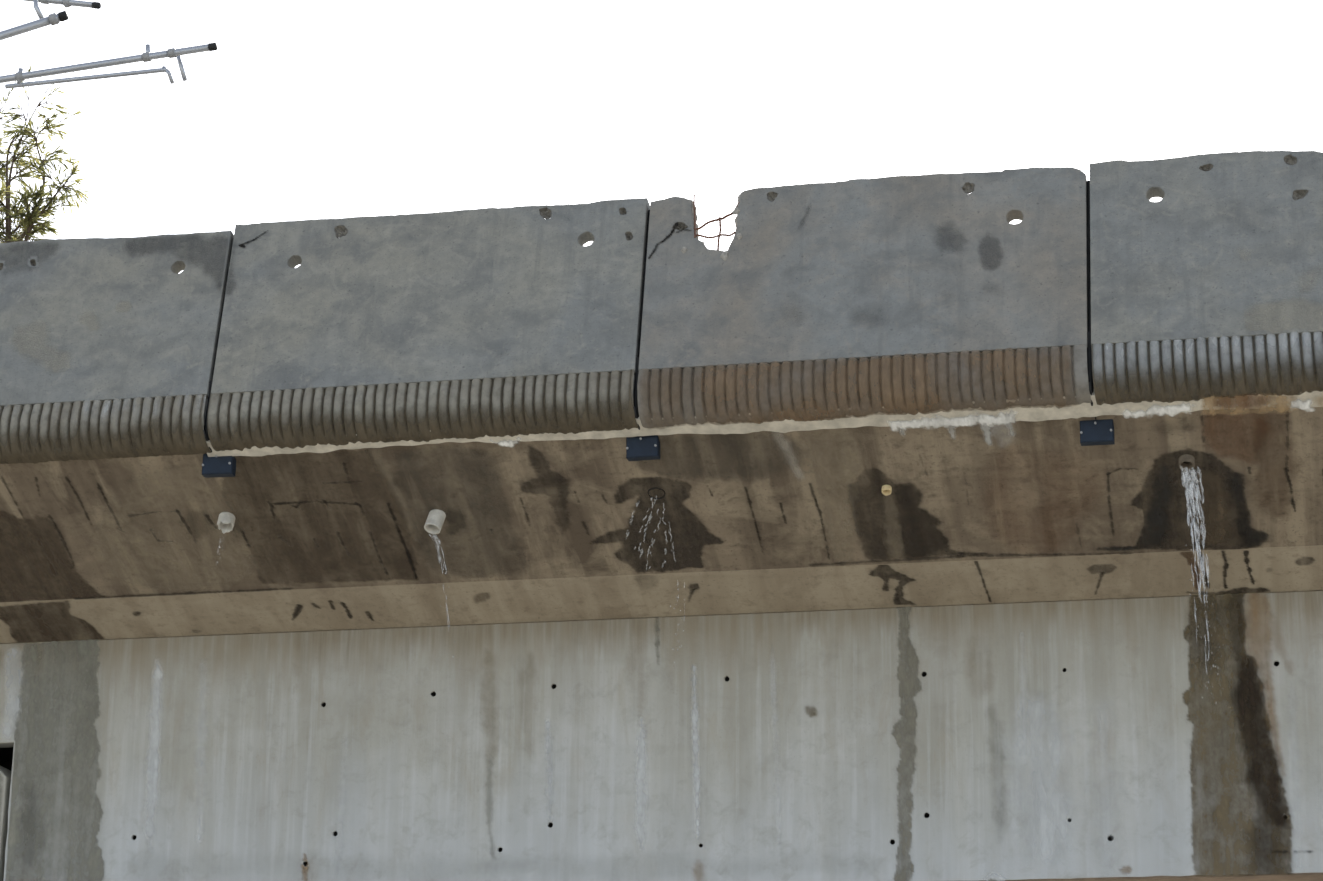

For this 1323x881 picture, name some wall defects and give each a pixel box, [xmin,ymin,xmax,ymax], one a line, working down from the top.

spalling [672,194,742,261]
damp [0,511,313,881]
damp [293,601,373,620]
damp [592,442,723,572]
damp [810,469,1032,881]
damp [1053,449,1292,876]